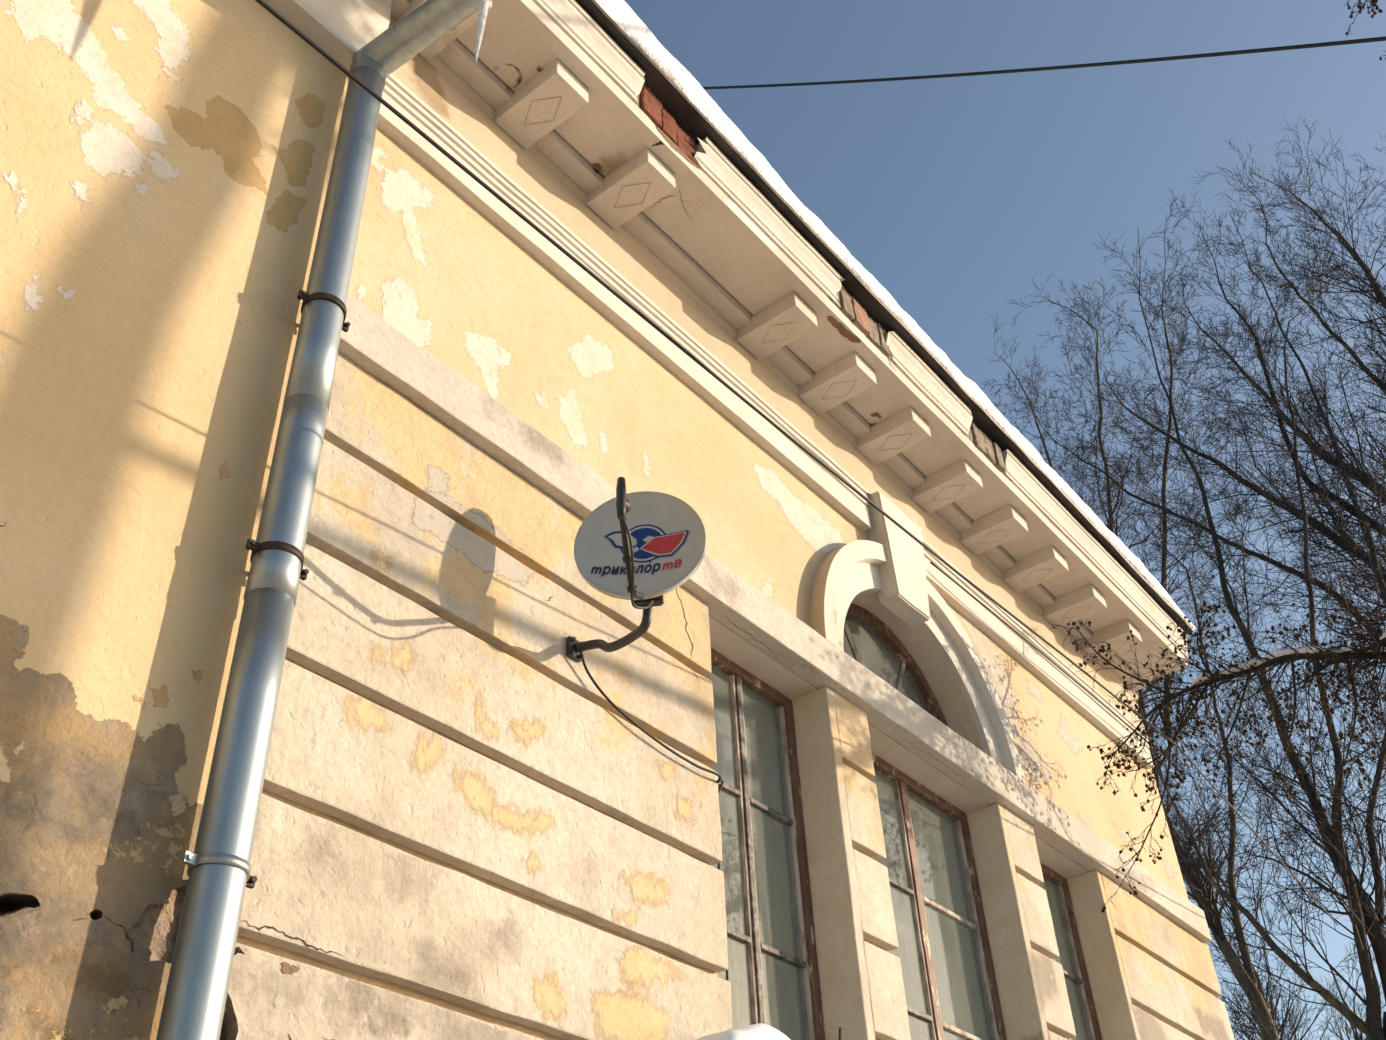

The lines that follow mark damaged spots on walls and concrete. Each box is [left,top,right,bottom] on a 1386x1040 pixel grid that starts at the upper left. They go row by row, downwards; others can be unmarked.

peeling [0,0,326,234]
spalling [631,84,699,169]
peeling [17,274,75,317]
peeling [751,463,845,554]
peeling [475,693,546,747]
peeling [0,614,203,1040]
peeling [410,732,555,876]
peeling [1018,750,1052,784]
crack [245,920,340,955]
peeling [612,870,669,926]
peeling [533,973,567,1021]
peeling [591,946,683,1040]